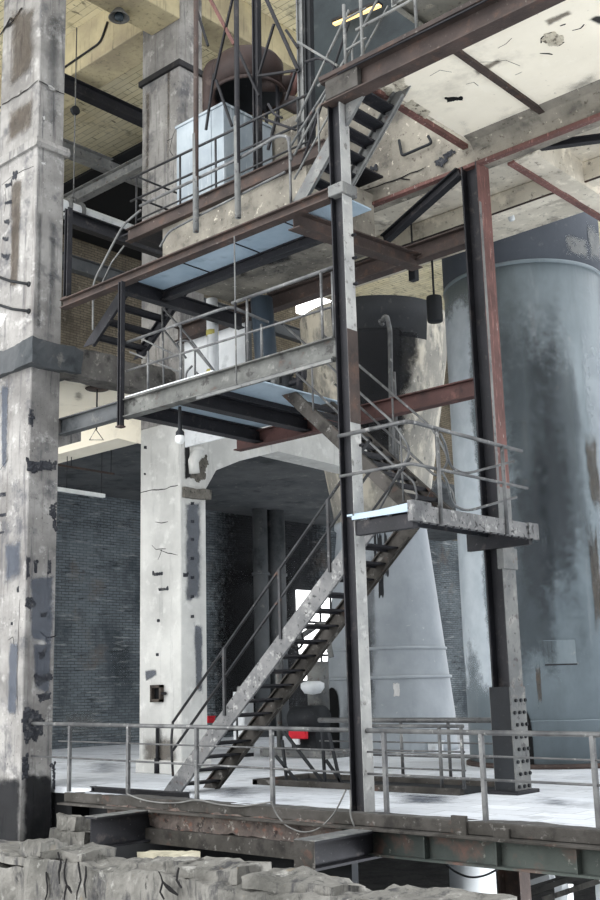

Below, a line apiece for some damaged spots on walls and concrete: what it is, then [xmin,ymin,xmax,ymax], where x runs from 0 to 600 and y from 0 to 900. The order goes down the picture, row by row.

flaking render [541,32,564,47]
crack [365,168,424,190]
leakage [585,349,600,478]
spalling [26,457,57,474]
spalling [190,454,209,483]
spalling [21,673,53,780]